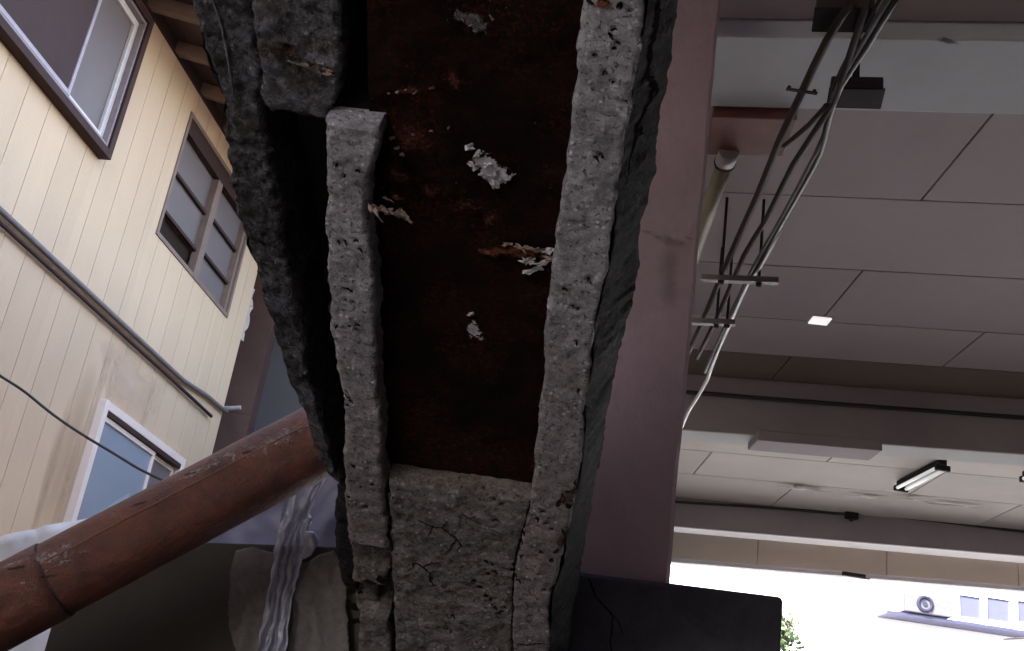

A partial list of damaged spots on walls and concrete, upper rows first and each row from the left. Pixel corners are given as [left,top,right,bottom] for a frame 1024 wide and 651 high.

peeling [454,10,494,35]
peeling [465,143,516,189]
peeling [367,188,413,224]
rust [480,242,554,275]
peeling [467,312,483,341]
crack [385,473,488,637]